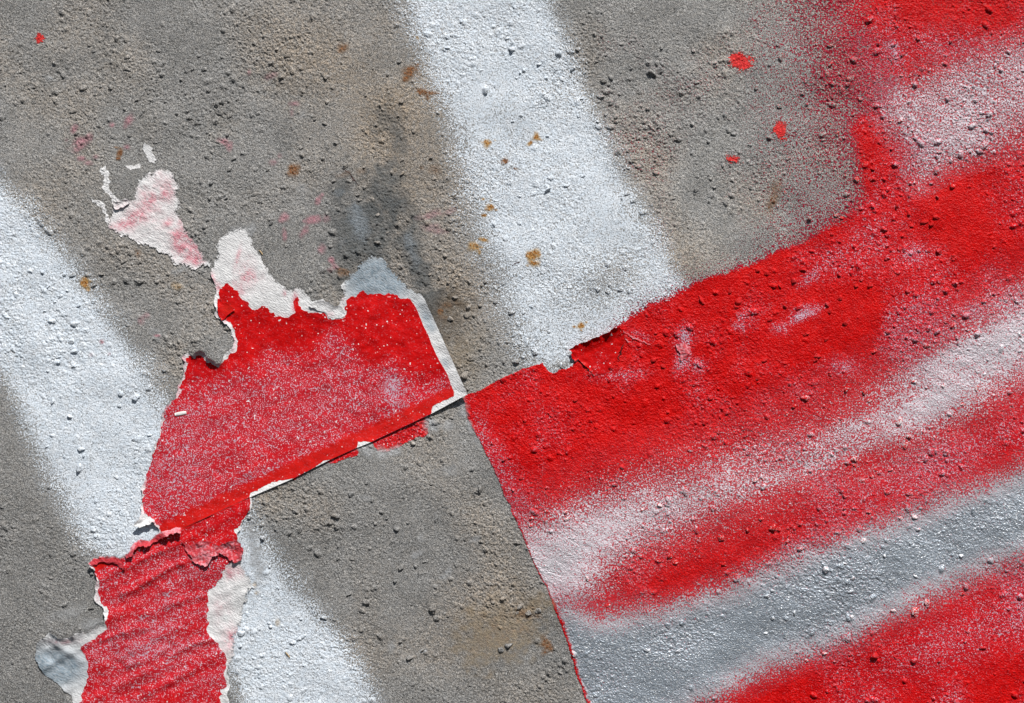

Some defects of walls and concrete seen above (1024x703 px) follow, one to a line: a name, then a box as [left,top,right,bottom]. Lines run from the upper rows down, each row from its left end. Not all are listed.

peeling [126,143,157,170]
peeling [372,415,429,452]
peeling [325,448,359,463]